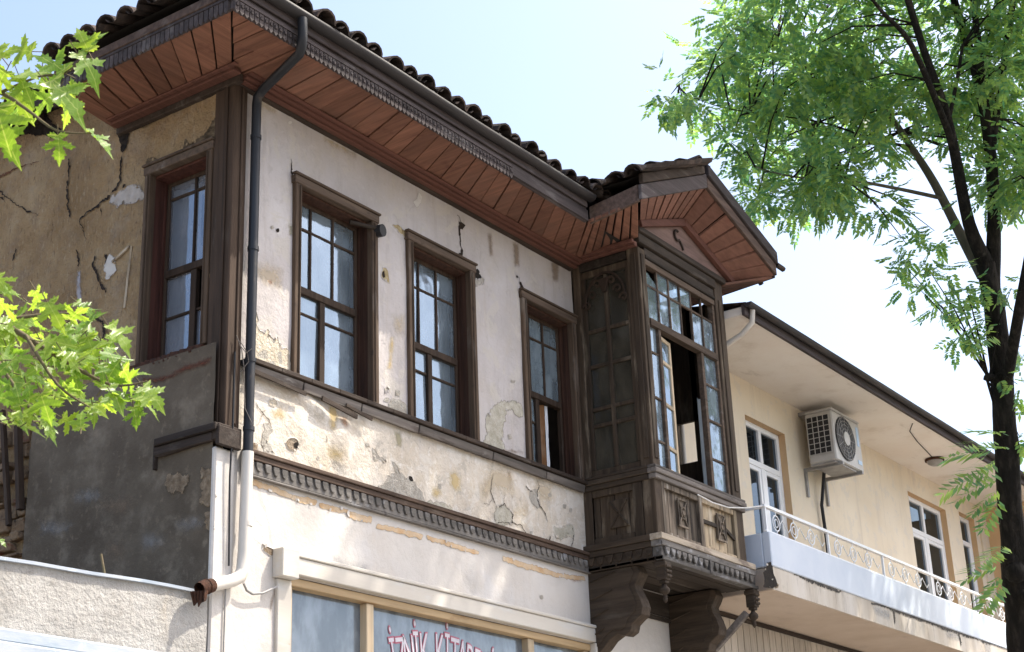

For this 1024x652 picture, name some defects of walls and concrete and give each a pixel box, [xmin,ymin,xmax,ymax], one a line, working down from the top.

crack [0,190,38,216]
crack [66,129,125,293]
crack [458,217,466,256]
peeling [253,423,301,455]
peeling [484,400,523,449]
spalling [164,467,217,531]
peeling [253,479,479,554]
peeling [366,443,453,510]
peeling [494,505,514,526]
peeling [529,489,551,509]